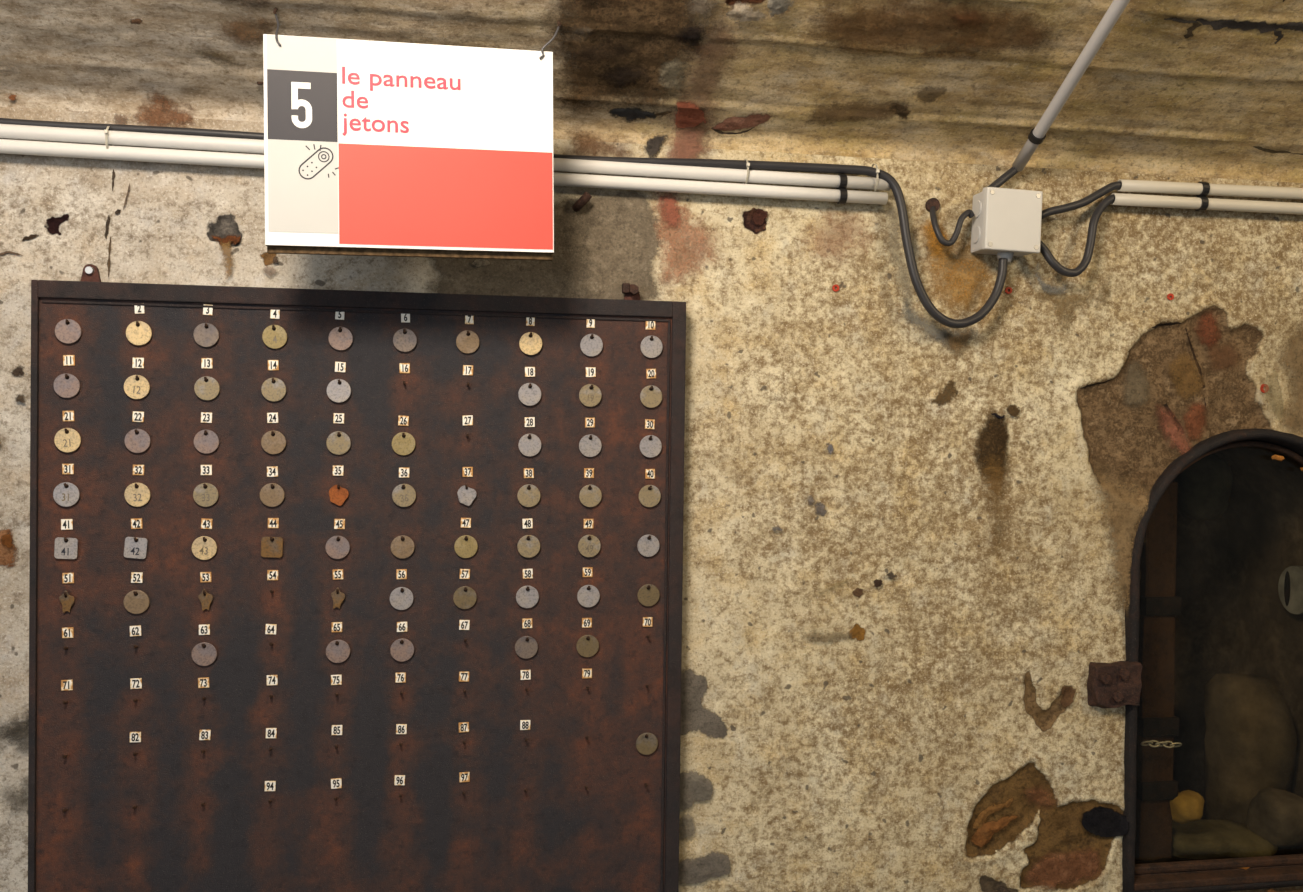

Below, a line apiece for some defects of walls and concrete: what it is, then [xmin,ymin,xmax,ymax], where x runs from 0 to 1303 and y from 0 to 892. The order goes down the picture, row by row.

crack [1164,0,1303,44]
water stain [547,0,706,122]
rust [114,93,193,126]
water stain [644,135,668,158]
peeling [673,101,771,158]
flaking render [1077,306,1303,610]
flaking render [1023,671,1076,732]
flaking render [966,762,1129,892]